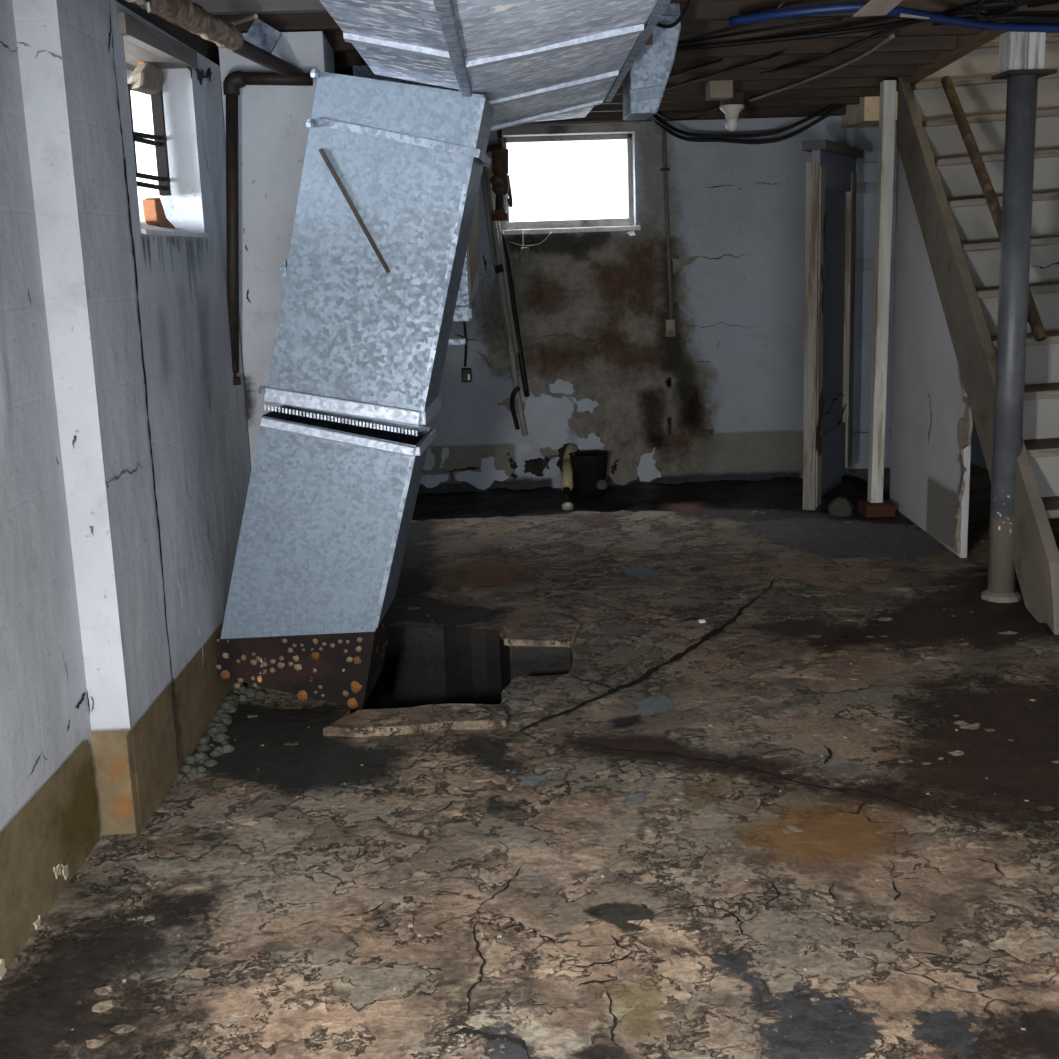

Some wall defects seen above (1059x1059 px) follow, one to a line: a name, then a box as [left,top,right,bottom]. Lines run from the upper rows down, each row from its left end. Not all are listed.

water stain [479,124,803,487]
crack [105,2,185,767]
water stain [418,445,552,495]
peeling [420,379,661,490]
peeling [741,365,973,559]
corrosion [216,637,363,689]
corrosion [297,685,325,701]
corrosion [343,681,362,709]
crack [513,578,775,735]
water stain [567,675,1059,823]
crack [448,862,531,1059]
crack [568,935,653,1046]